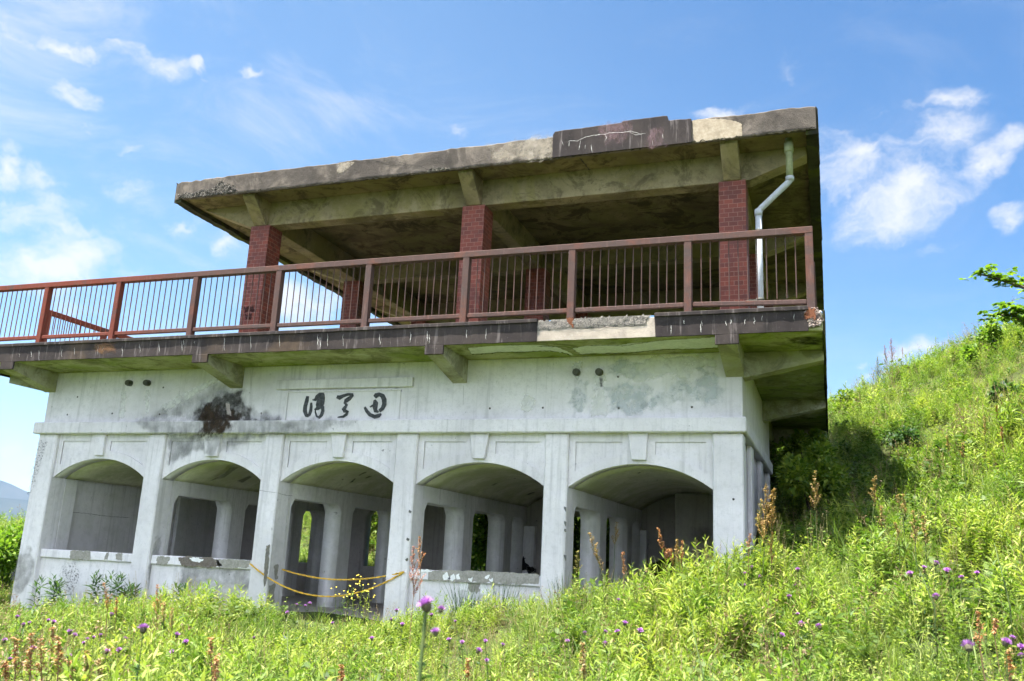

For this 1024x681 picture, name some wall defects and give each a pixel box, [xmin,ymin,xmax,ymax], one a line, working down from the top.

spalling [177,181,237,199]
spalling [537,314,651,331]
spalling [804,307,824,328]
water stain [194,391,251,437]
peeling [156,556,250,569]